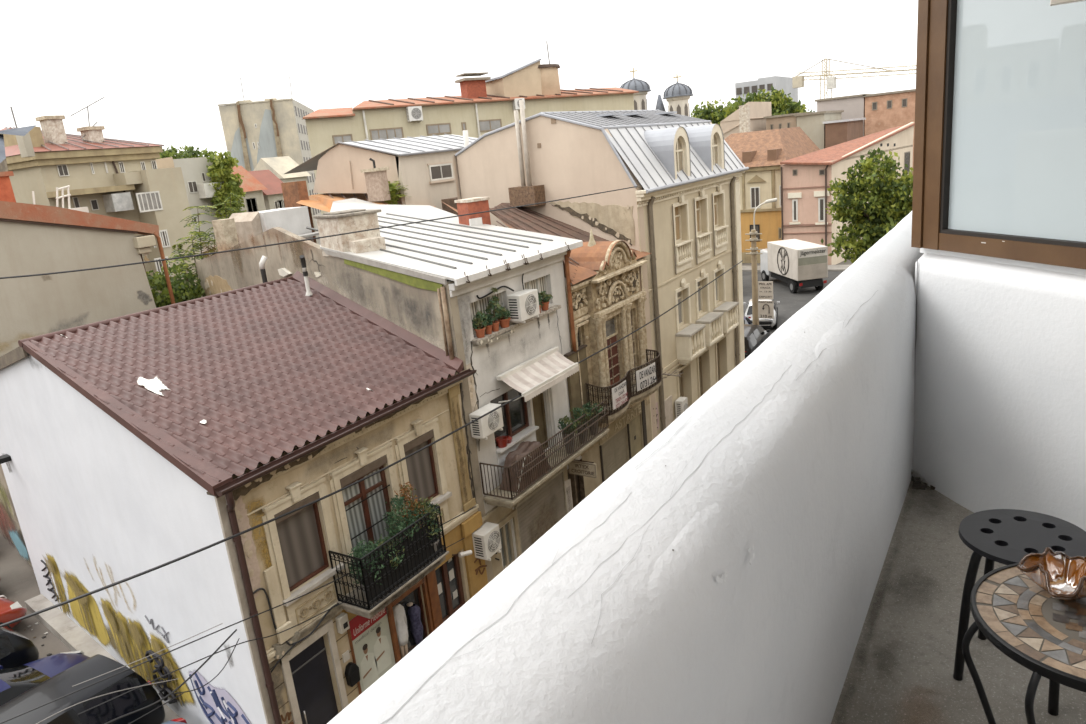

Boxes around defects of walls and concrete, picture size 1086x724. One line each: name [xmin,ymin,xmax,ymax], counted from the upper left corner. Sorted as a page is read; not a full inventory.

crack [460,341,500,504]
crack [381,416,692,724]
crack [568,348,826,644]